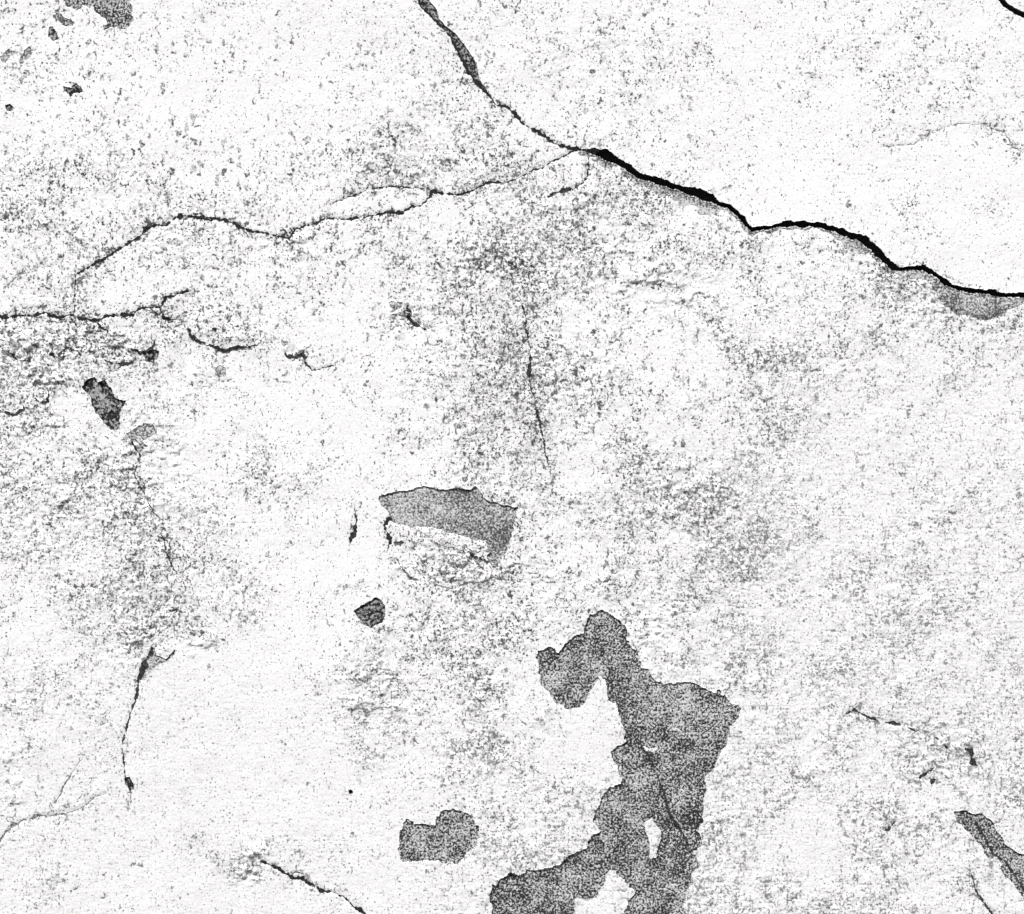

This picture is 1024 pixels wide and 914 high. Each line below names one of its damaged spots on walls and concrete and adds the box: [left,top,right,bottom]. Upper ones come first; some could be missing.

spalling [48,0,133,41]
crack [0,0,1024,331]
crack [284,352,335,371]
spalling [379,486,518,568]
crack [122,648,153,803]
spalling [490,609,741,914]
crack [260,860,366,914]
spalling [398,808,479,864]
spalling [954,810,1024,899]